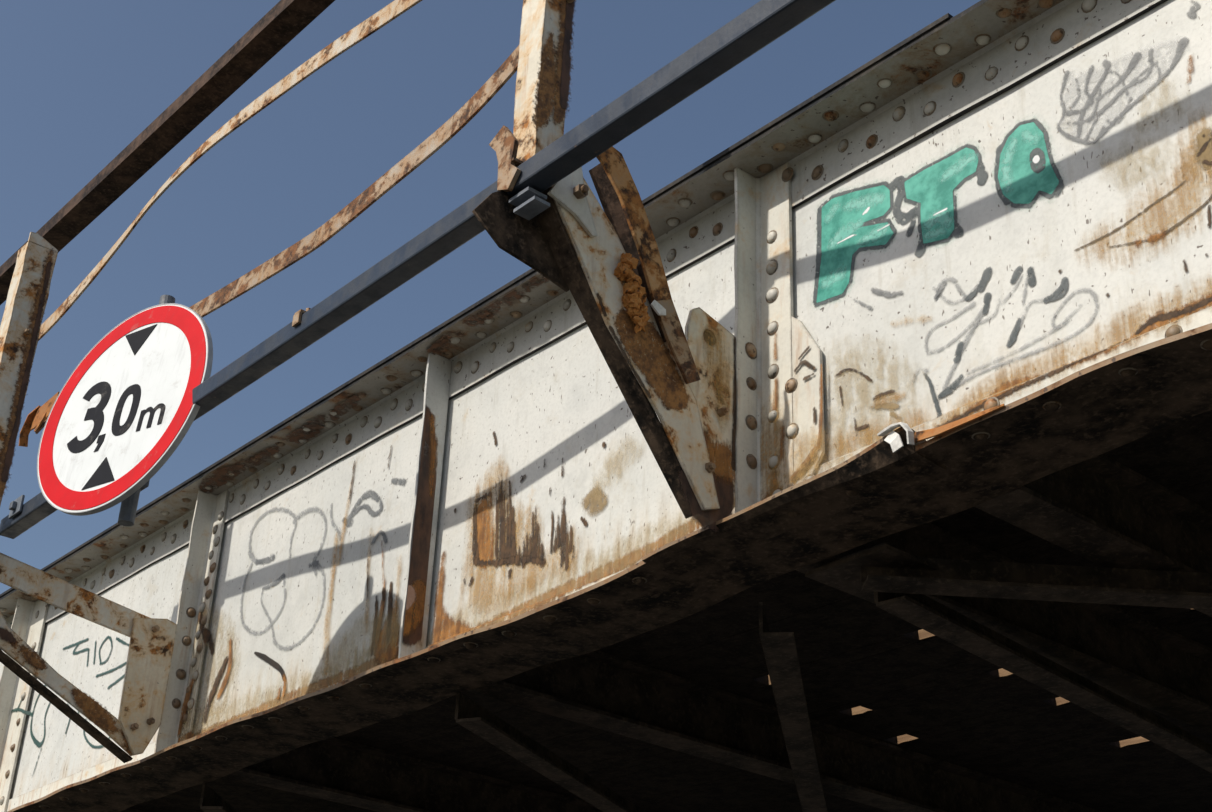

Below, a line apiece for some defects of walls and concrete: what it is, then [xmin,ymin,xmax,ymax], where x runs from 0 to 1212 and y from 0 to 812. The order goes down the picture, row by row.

corrosion [532,0,576,131]
corrosion [0,248,54,497]
corrosion [597,293,689,410]
corrosion [760,346,823,500]
corrosion [936,282,1212,428]
corrosion [177,333,737,743]
corrosion [0,627,47,670]
corrosion [71,688,118,732]